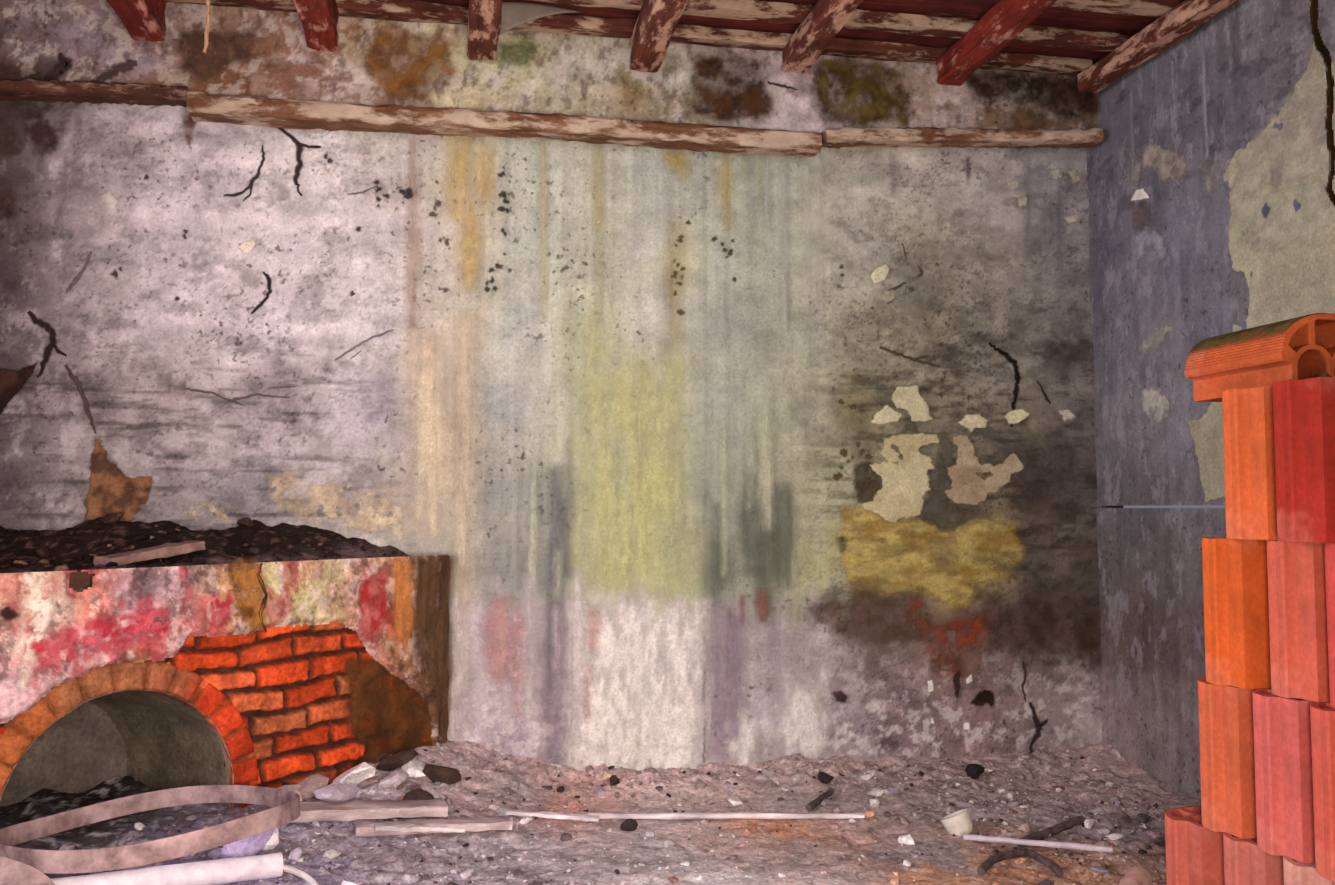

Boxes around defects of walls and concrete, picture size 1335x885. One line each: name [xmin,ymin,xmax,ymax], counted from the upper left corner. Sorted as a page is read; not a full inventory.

crack [223,128,322,201]
damp [691,56,772,121]
damp [812,59,910,126]
peeling [1218,42,1335,332]
crack [1231,0,1335,215]
crack [251,272,272,314]
spalling [83,439,152,523]
damp [271,322,756,771]
damp [812,437,1024,643]
peeling [862,385,1023,523]
crack [989,343,1051,427]
spalling [167,621,373,788]